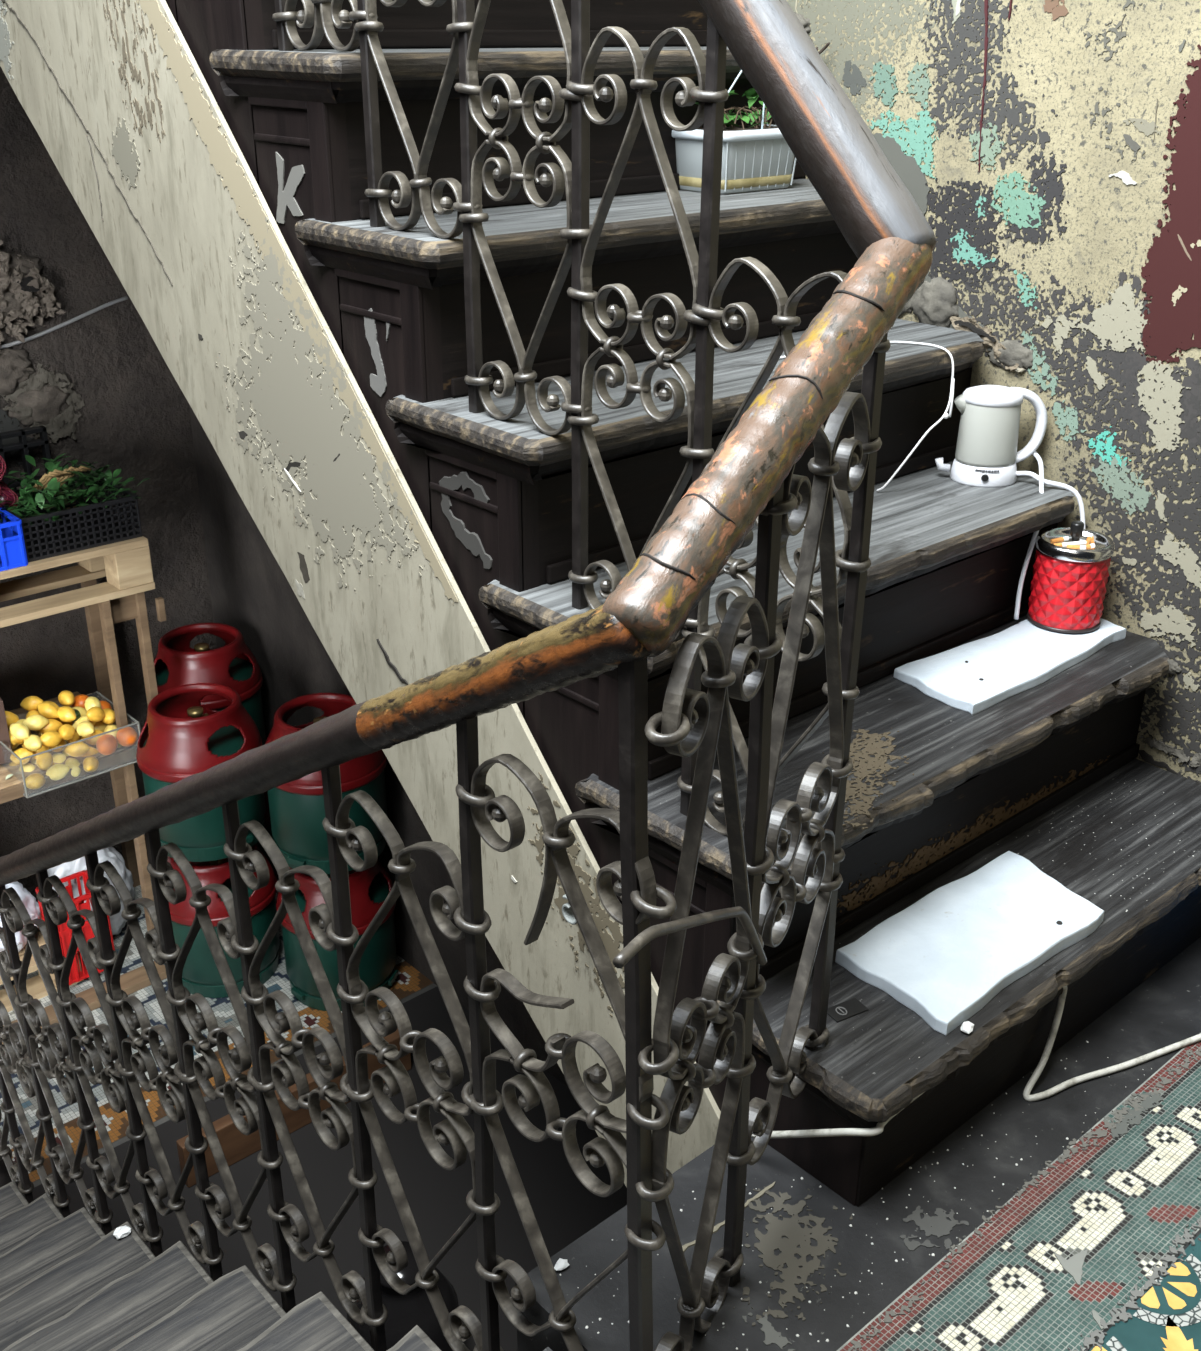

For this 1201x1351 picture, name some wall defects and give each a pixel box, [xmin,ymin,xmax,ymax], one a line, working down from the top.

crack [2,0,173,285]
peeling [103,0,165,151]
spalling [0,240,65,348]
peeling [914,0,1201,781]
spalling [295,552,310,599]